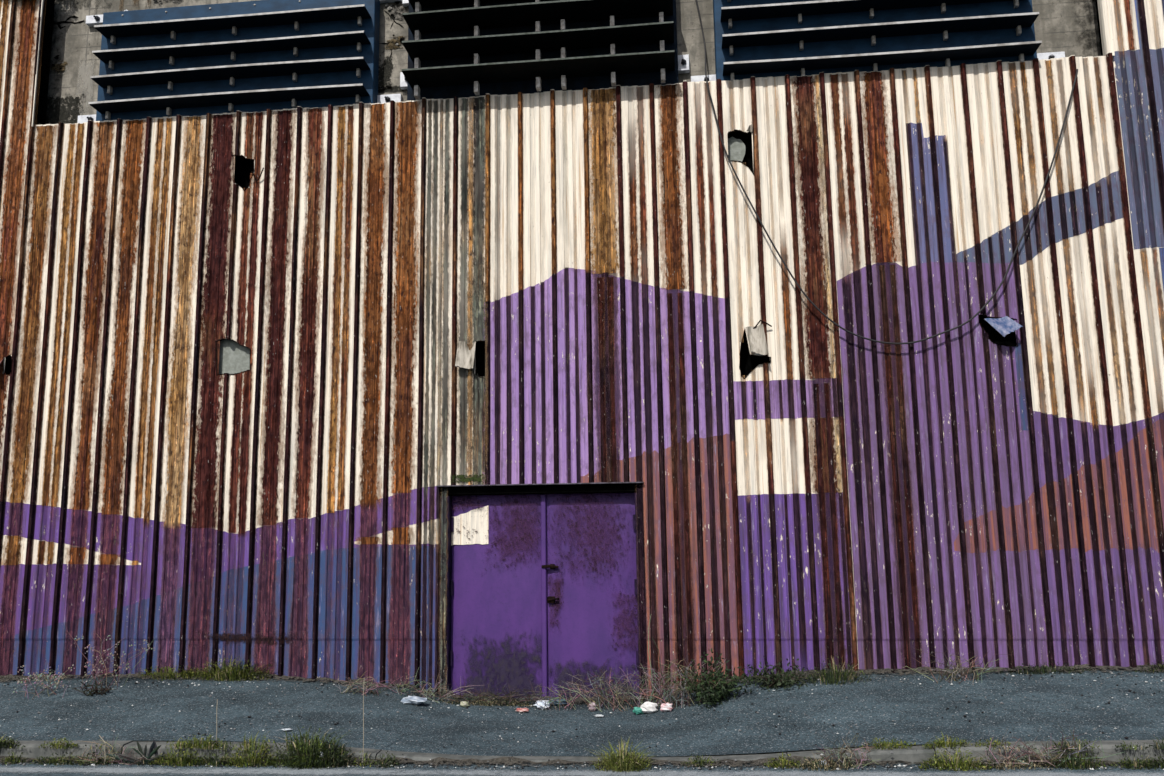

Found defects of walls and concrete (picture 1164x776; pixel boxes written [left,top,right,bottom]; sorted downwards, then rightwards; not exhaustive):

corrosion [0,0,782,700]
corrosion [778,0,1164,673]